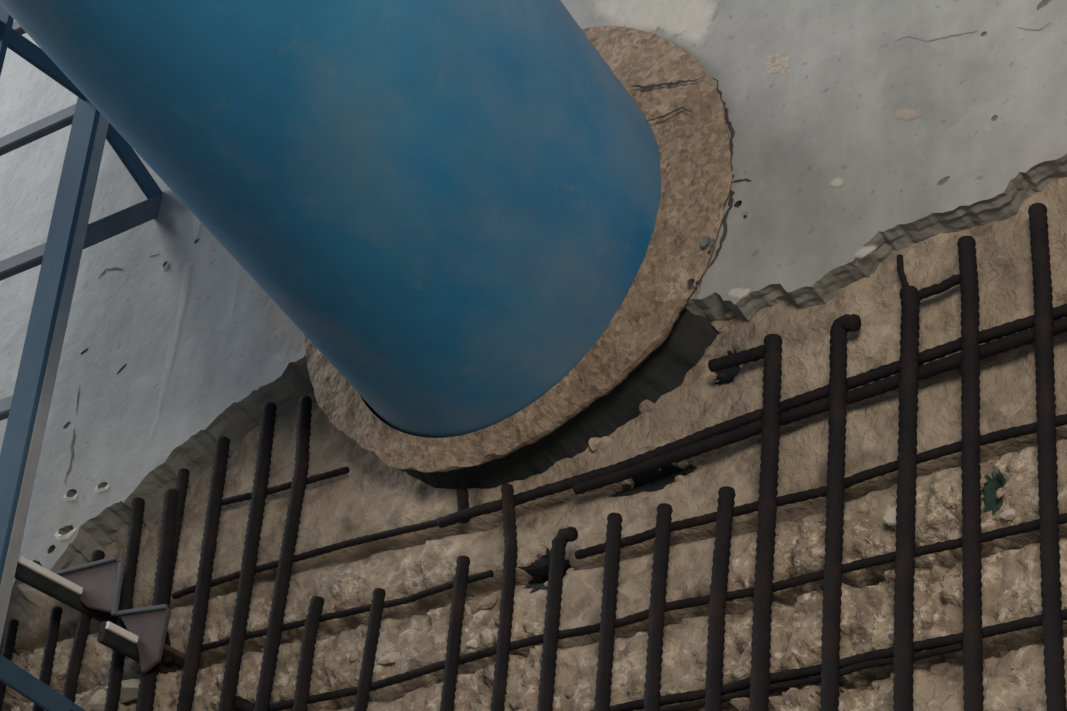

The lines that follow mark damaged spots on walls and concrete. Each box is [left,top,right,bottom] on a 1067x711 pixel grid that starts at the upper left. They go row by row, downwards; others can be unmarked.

spalling [0,154,1067,711]